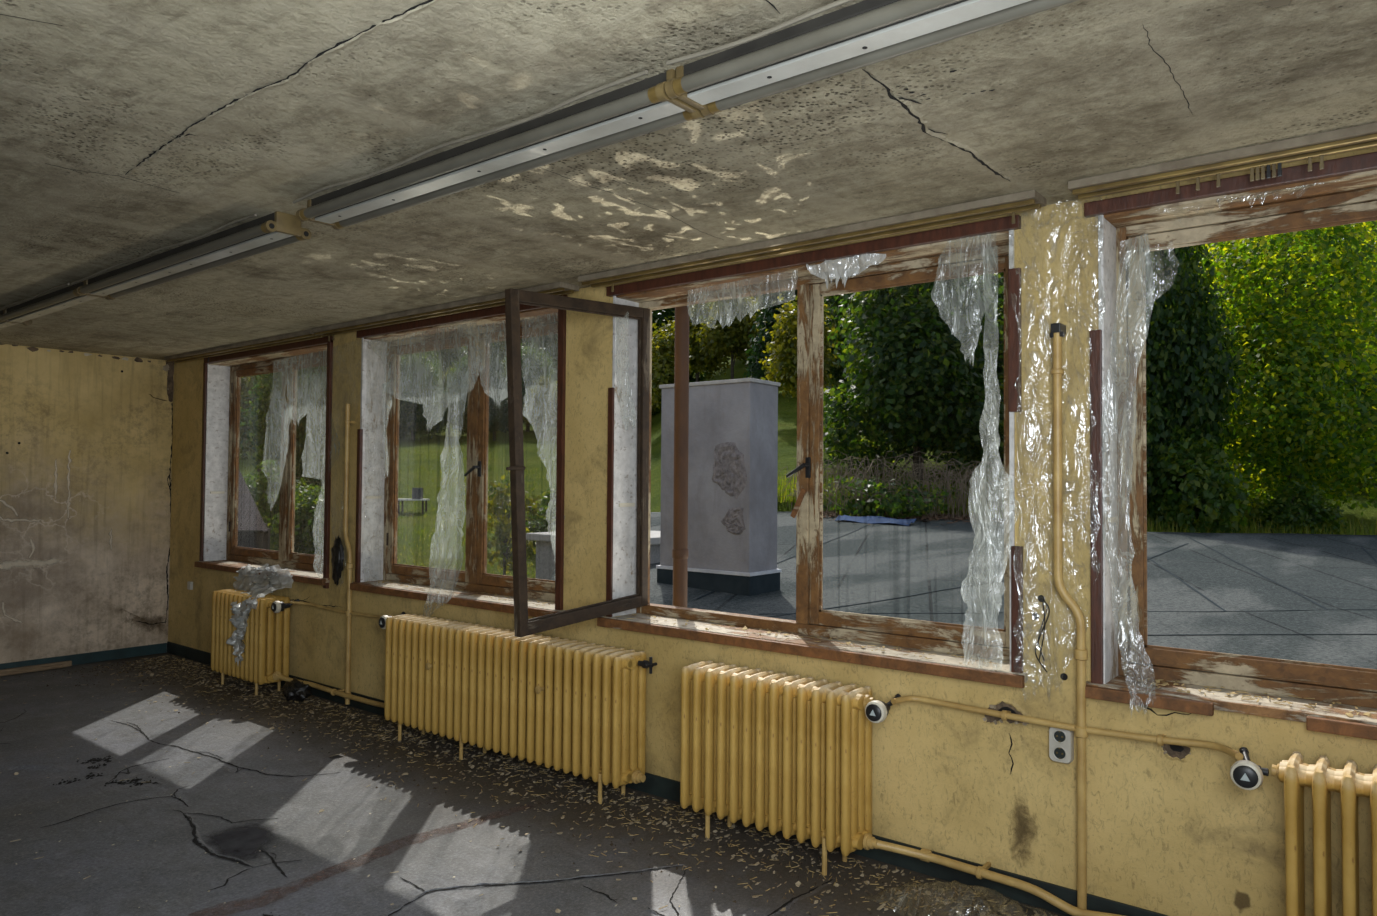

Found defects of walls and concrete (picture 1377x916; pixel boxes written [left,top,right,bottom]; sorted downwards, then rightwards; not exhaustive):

crack [45,0,439,193]
crack [862,66,1014,181]
crack [41,720,341,891]
water stain [1015,807,1033,853]
crack [383,864,688,916]
crack [767,879,836,916]